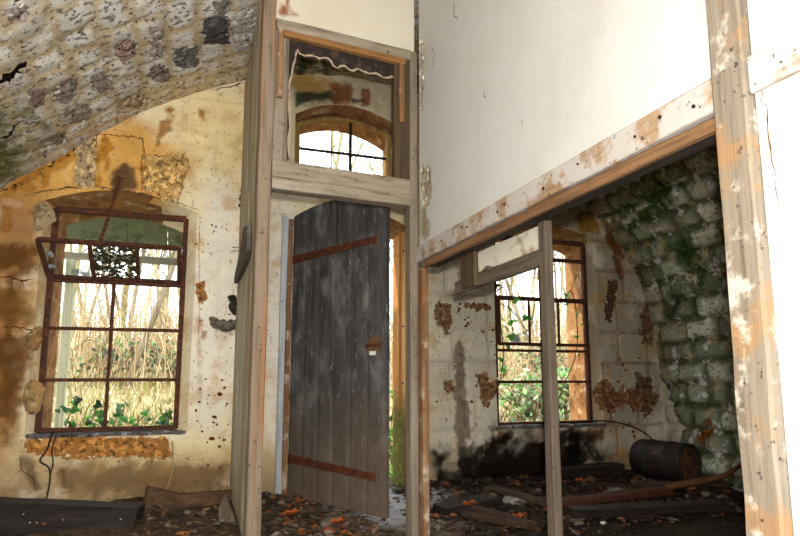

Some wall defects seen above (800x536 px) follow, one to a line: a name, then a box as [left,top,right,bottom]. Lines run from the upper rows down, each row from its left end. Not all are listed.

crack [0,61,27,84]
crack [759,90,779,210]
spalling [141,151,191,202]
leakage [0,245,38,280]
peeling [195,281,207,305]
peeling [433,301,492,337]
leakage [0,336,29,422]
leakage [454,342,470,475]
peeling [435,372,498,408]
peeling [592,357,659,440]
spalling [24,435,174,470]
leakage [432,451,448,481]